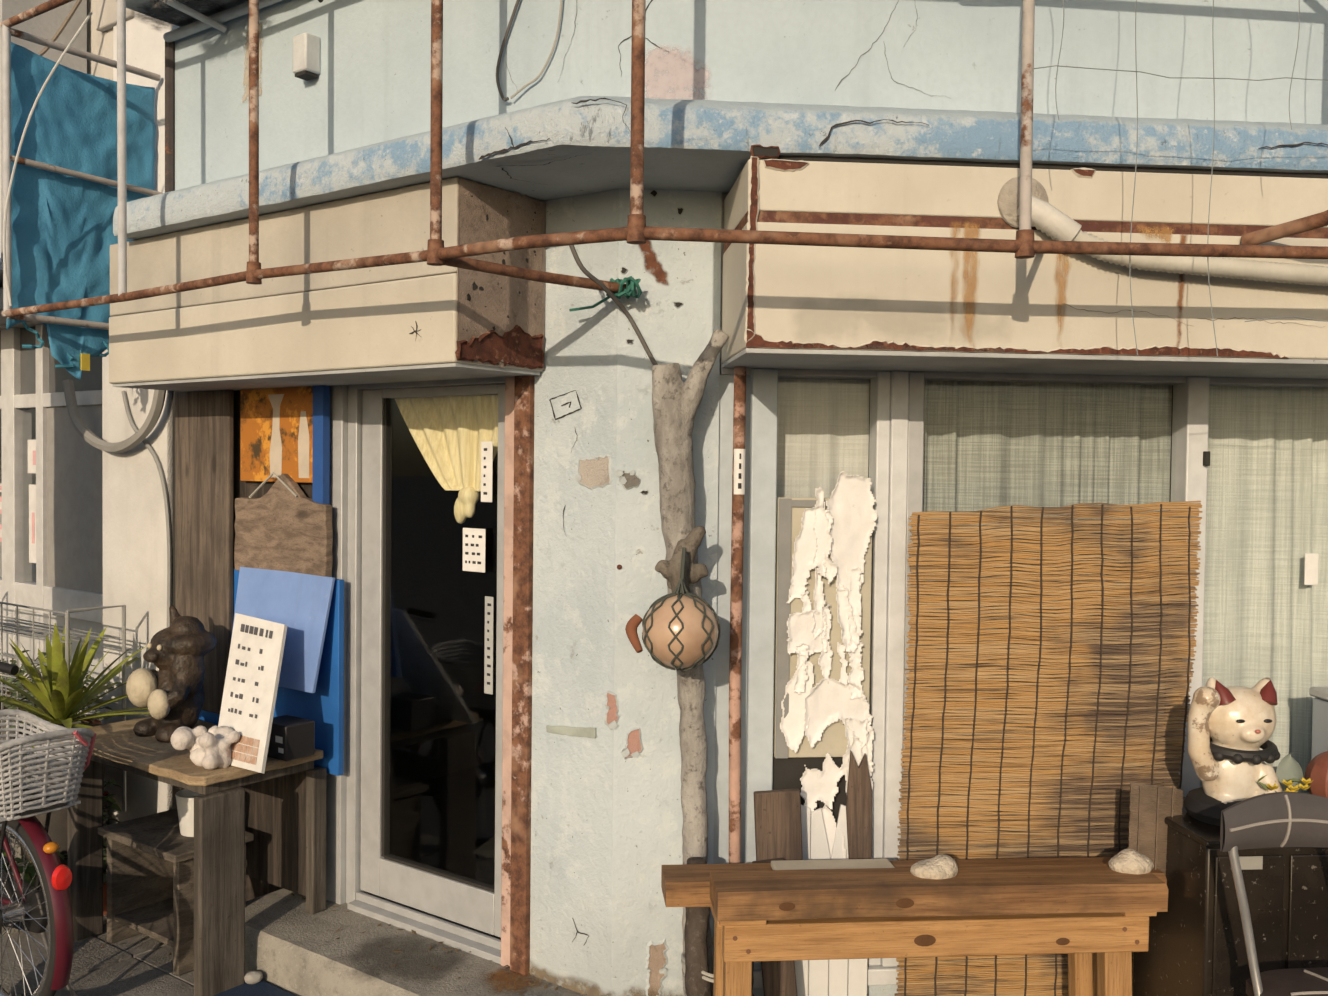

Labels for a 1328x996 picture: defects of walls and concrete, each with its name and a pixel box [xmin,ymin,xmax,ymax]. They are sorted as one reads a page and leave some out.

crack [558,0,707,131]
peeling [645,48,709,100]
crack [819,0,947,146]
crack [479,129,590,184]
crack [1258,141,1328,149]
spalling [458,180,543,343]
rust [744,156,1290,358]
crack [1063,303,1325,328]
peeling [574,454,649,495]
peeling [604,691,644,760]